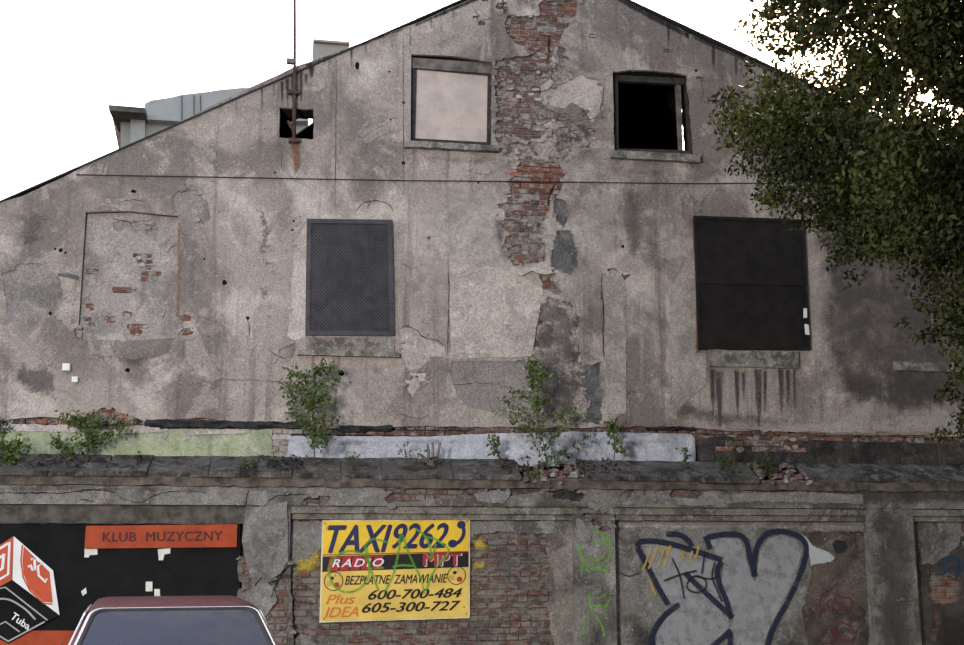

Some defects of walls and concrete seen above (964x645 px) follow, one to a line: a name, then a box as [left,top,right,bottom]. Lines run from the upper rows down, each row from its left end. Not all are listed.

corrosion [292,143,300,171]
peeling [272,0,964,457]
peeling [2,253,161,325]
flaking render [74,304,149,339]
flaking render [175,314,197,341]
damp [681,369,795,425]
peeling [236,491,350,645]
peeling [383,488,870,645]
peeling [918,522,964,641]